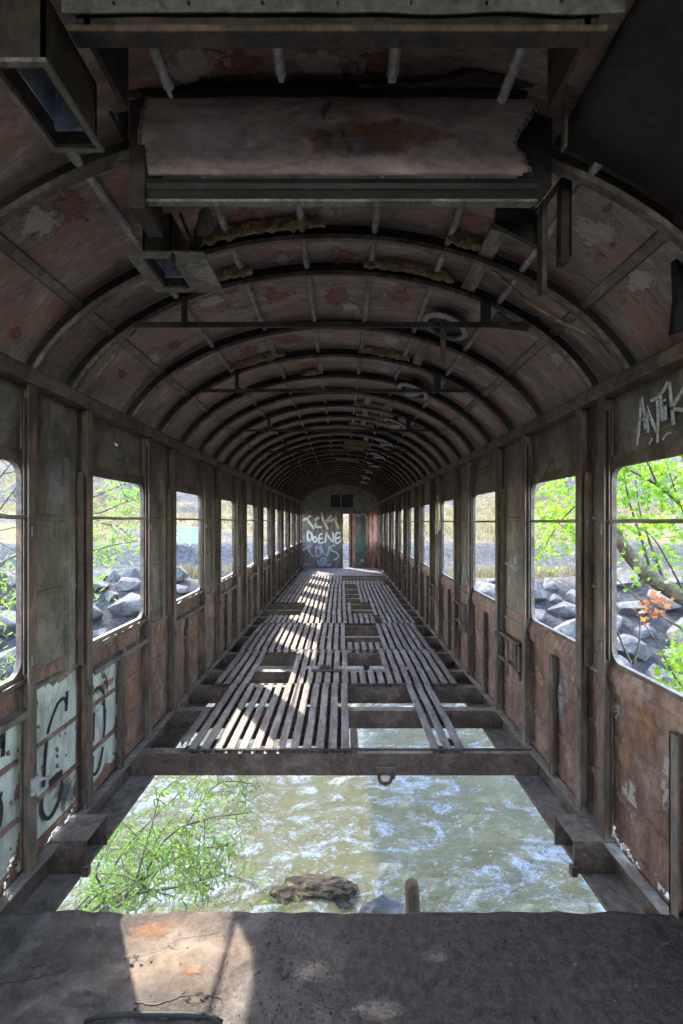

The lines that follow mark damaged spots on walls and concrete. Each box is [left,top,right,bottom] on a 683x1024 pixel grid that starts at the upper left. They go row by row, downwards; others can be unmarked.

peeling [13,200,78,242]
peeling [572,204,625,261]
peeling [617,773,638,827]
peeling [652,755,669,820]